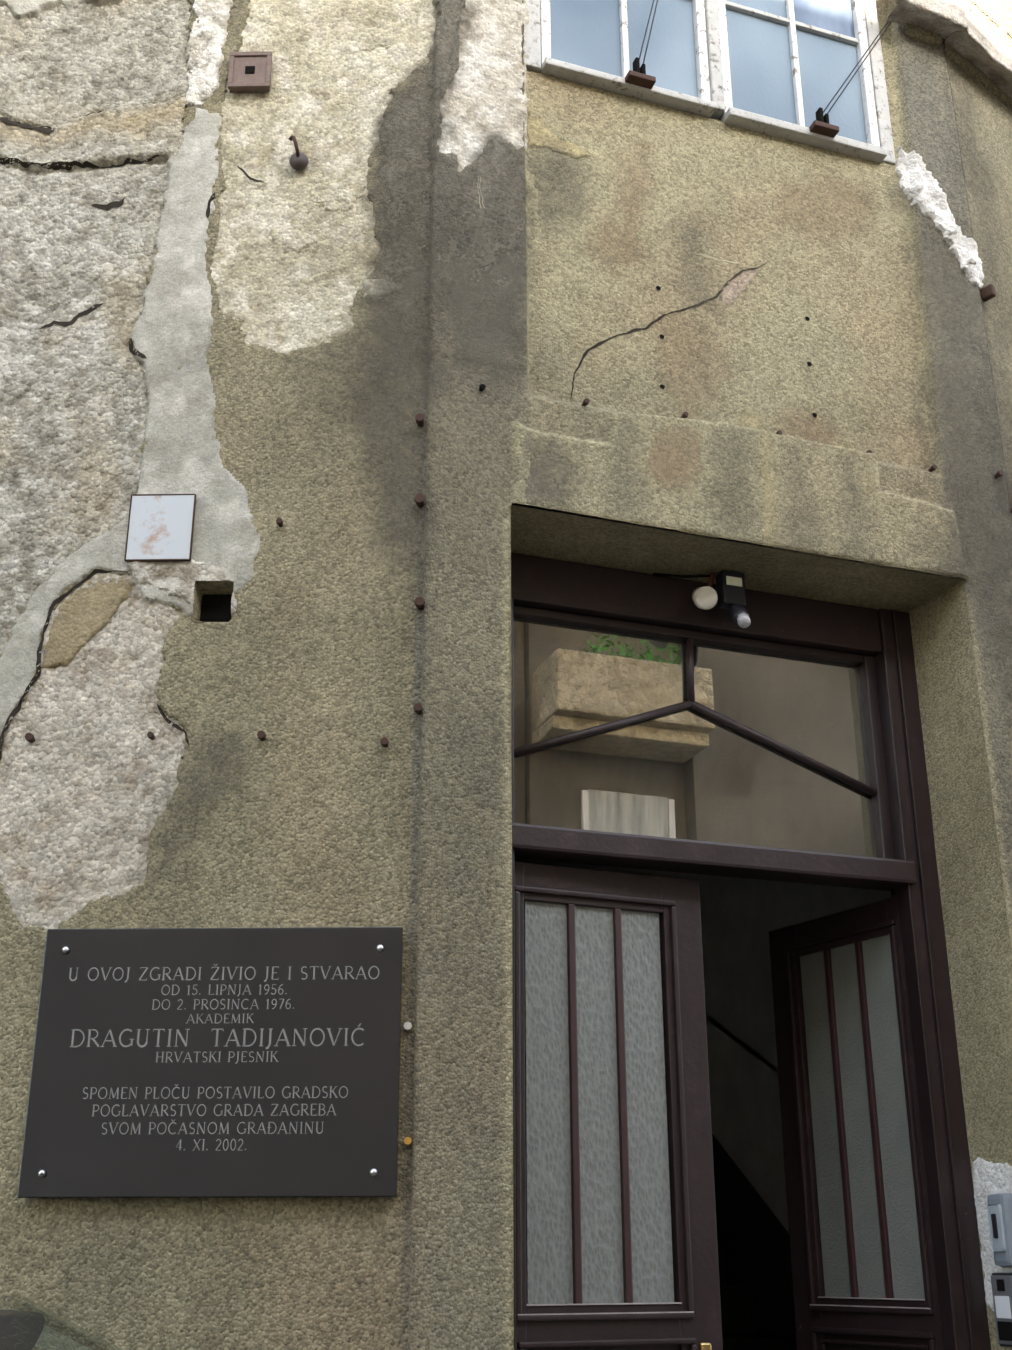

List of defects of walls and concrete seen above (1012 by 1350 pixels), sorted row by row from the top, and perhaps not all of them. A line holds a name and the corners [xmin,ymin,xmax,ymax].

crack [0,117,163,211]
flaking render [210,0,436,354]
flaking render [432,0,589,172]
crack [40,303,104,329]
flaking render [0,0,191,654]
water stain [365,0,528,544]
crack [571,253,770,405]
spalling [200,594,232,622]
flaking render [0,572,188,930]